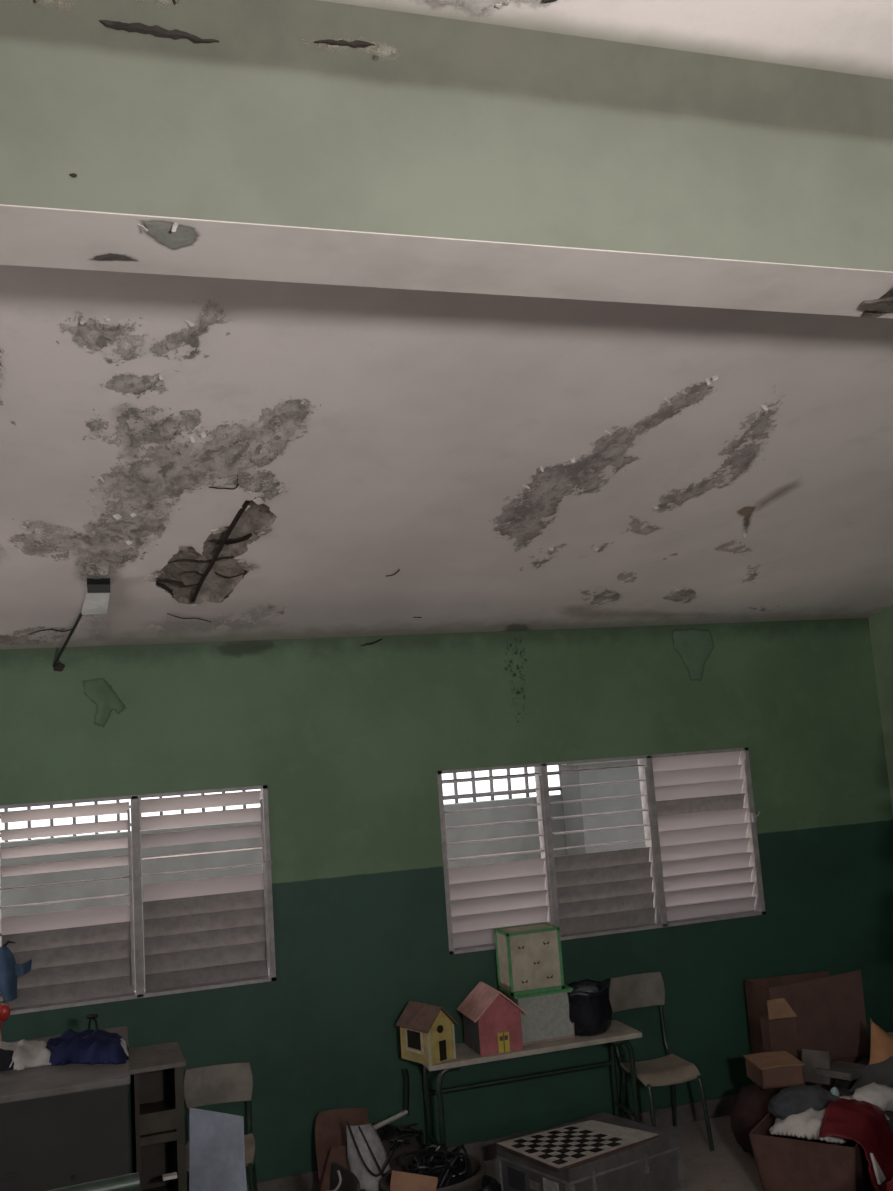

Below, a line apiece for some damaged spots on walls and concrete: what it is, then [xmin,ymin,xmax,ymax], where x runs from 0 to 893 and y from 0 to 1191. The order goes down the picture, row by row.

crack [100,20,219,43]
crack [315,39,375,48]
peeling [138,220,198,250]
spalling [859,288,893,318]
peeling [7,301,321,607]
peeling [489,375,718,571]
peeling [592,385,785,552]